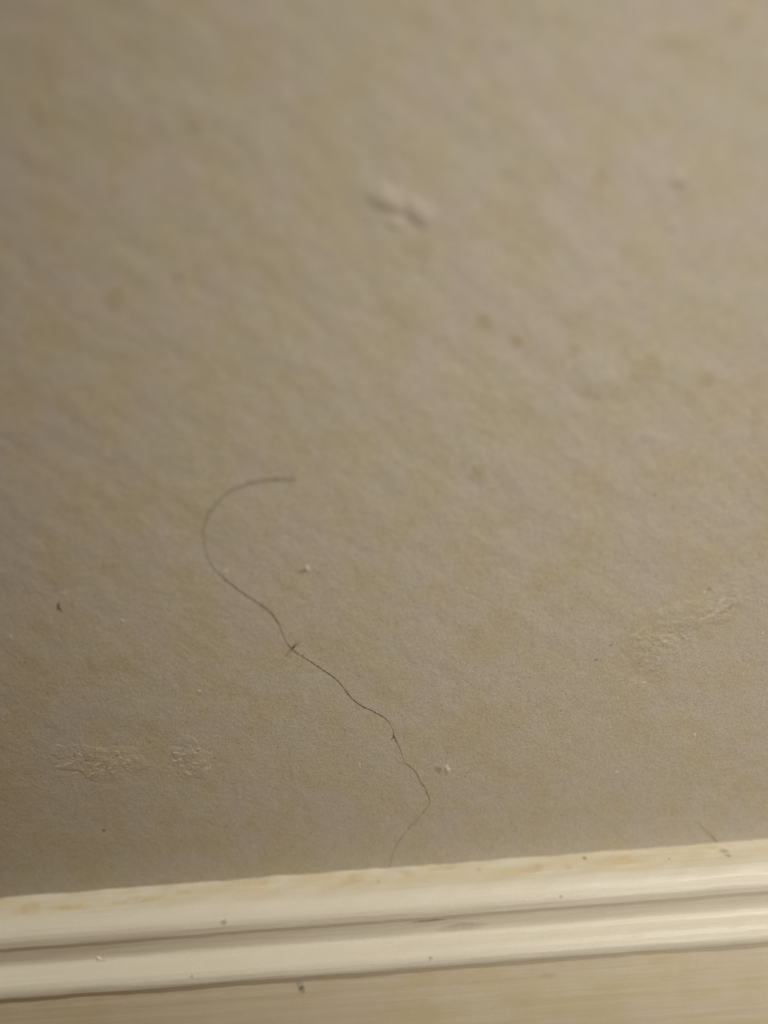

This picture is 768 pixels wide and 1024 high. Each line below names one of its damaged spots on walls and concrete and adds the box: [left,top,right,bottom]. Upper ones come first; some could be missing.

crack [202,477,430,868]